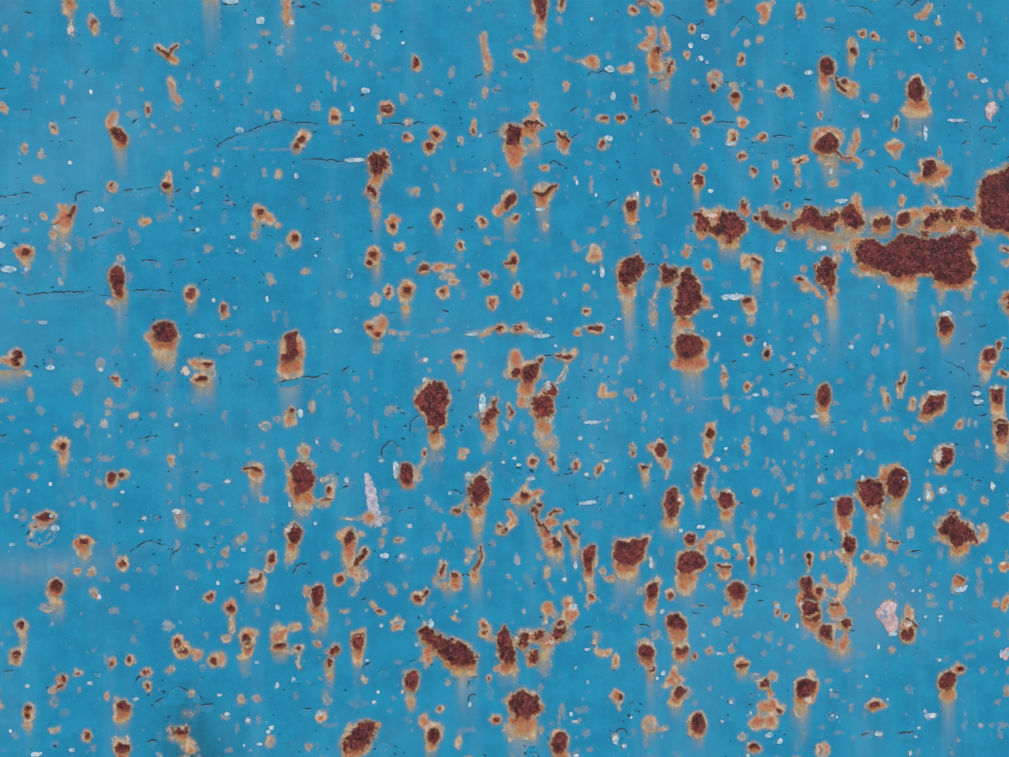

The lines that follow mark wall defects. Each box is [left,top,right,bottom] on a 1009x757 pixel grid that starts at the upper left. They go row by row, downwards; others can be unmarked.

rust [649,149,1009,384]
rust [144,320,216,393]
rust [277,330,305,394]
rust [285,443,335,510]
rust [398,379,451,489]
rust [411,468,491,605]
rust [796,464,910,656]
rust [936,496,988,560]
rust [401,596,579,707]
rust [637,613,712,708]
rust [341,718,381,757]
rust [489,688,570,757]